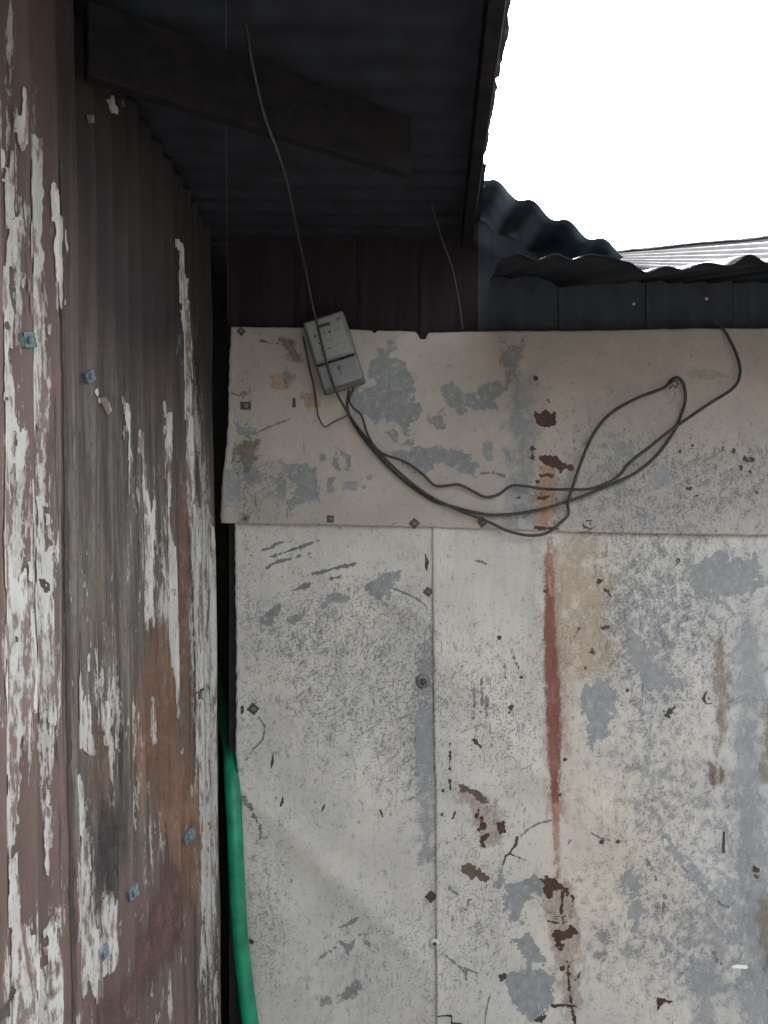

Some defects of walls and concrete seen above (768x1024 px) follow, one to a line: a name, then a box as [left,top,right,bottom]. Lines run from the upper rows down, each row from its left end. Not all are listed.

peeling [106,95,118,114]
rust [533,399,557,427]
peeling [0,87,68,1024]
peeling [95,238,218,827]
peeling [79,653,118,757]
rust [516,445,581,1024]
rust [458,783,506,848]
peeling [75,774,119,1004]
rust [461,862,491,887]